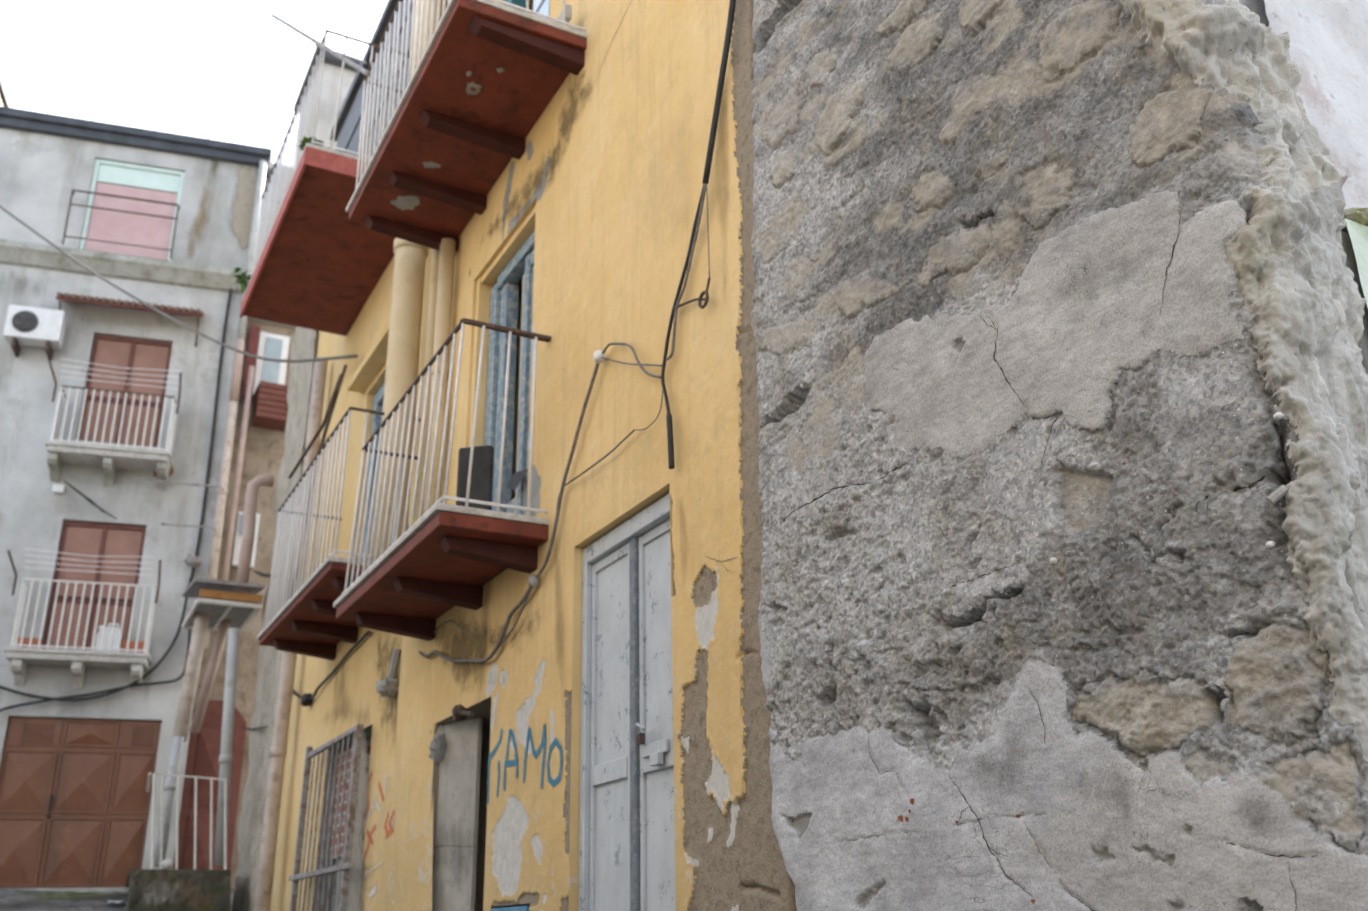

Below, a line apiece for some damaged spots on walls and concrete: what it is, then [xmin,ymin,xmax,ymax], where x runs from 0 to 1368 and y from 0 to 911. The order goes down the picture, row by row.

spalling [466,71,481,95]
crack [1160,209,1182,311]
crack [980,315,1058,460]
spalling [672,0,1368,911]
peeling [492,794,569,911]
crack [948,773,1050,897]